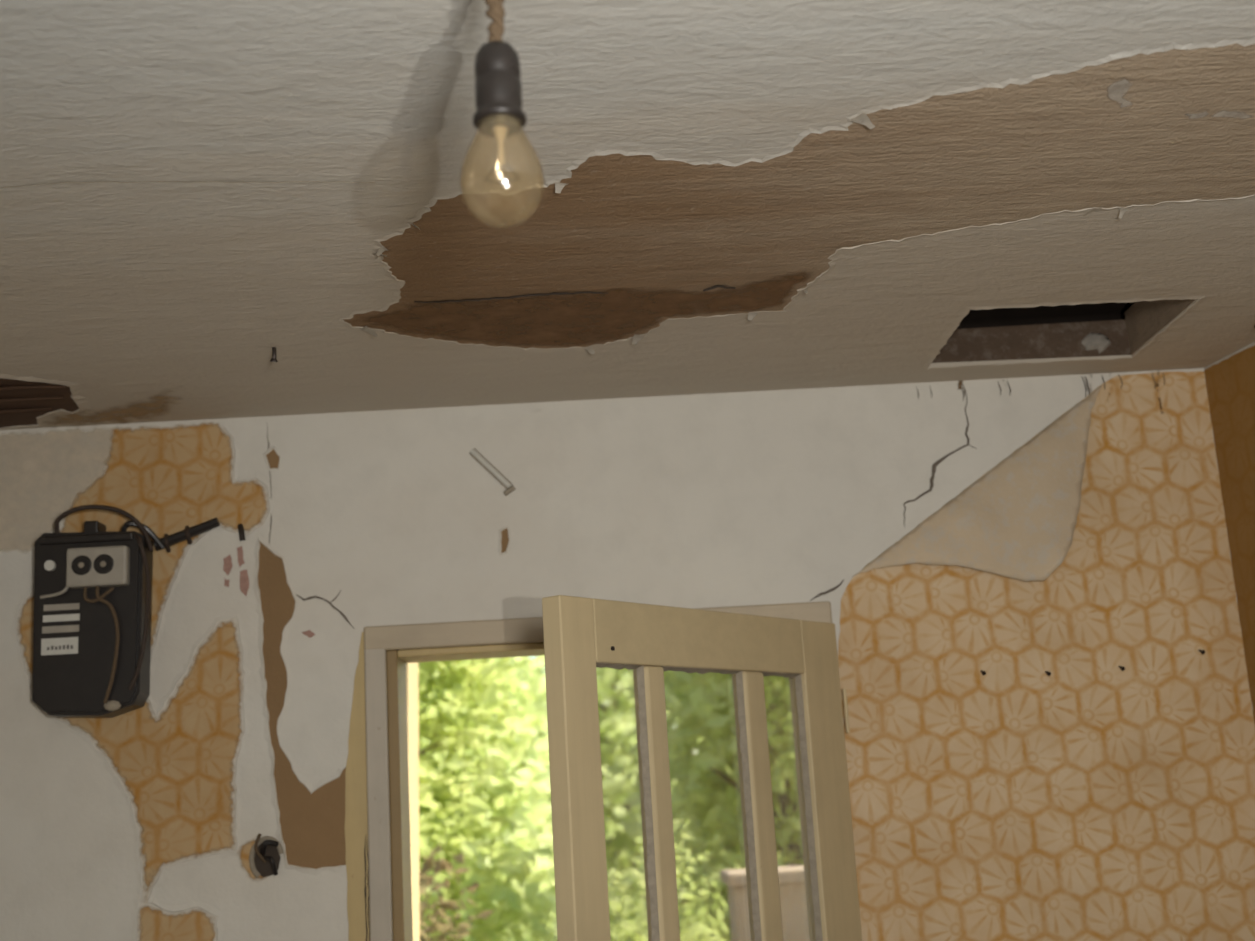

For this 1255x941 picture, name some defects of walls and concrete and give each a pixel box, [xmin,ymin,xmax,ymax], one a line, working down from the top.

peeling [340,38,1255,354]
crack [903,390,976,526]
peeling [0,423,346,941]